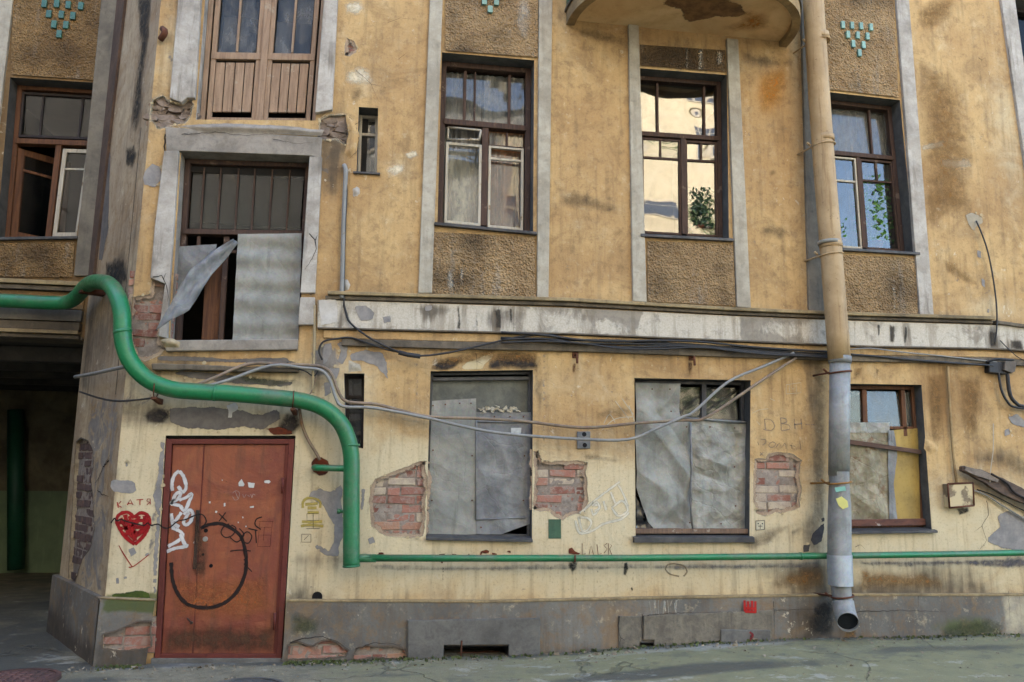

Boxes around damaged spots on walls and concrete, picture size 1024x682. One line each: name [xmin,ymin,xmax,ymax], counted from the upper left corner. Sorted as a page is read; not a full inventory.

flaking render [665,0,746,22]
flaking render [142,95,202,129]
flaking render [318,114,349,146]
flaking render [128,271,178,361]
flaking render [68,437,95,582]
flaking render [361,461,432,544]
flaking render [529,449,588,520]
flaking render [753,452,802,516]
flaking render [101,615,157,653]
flaking render [286,639,407,661]